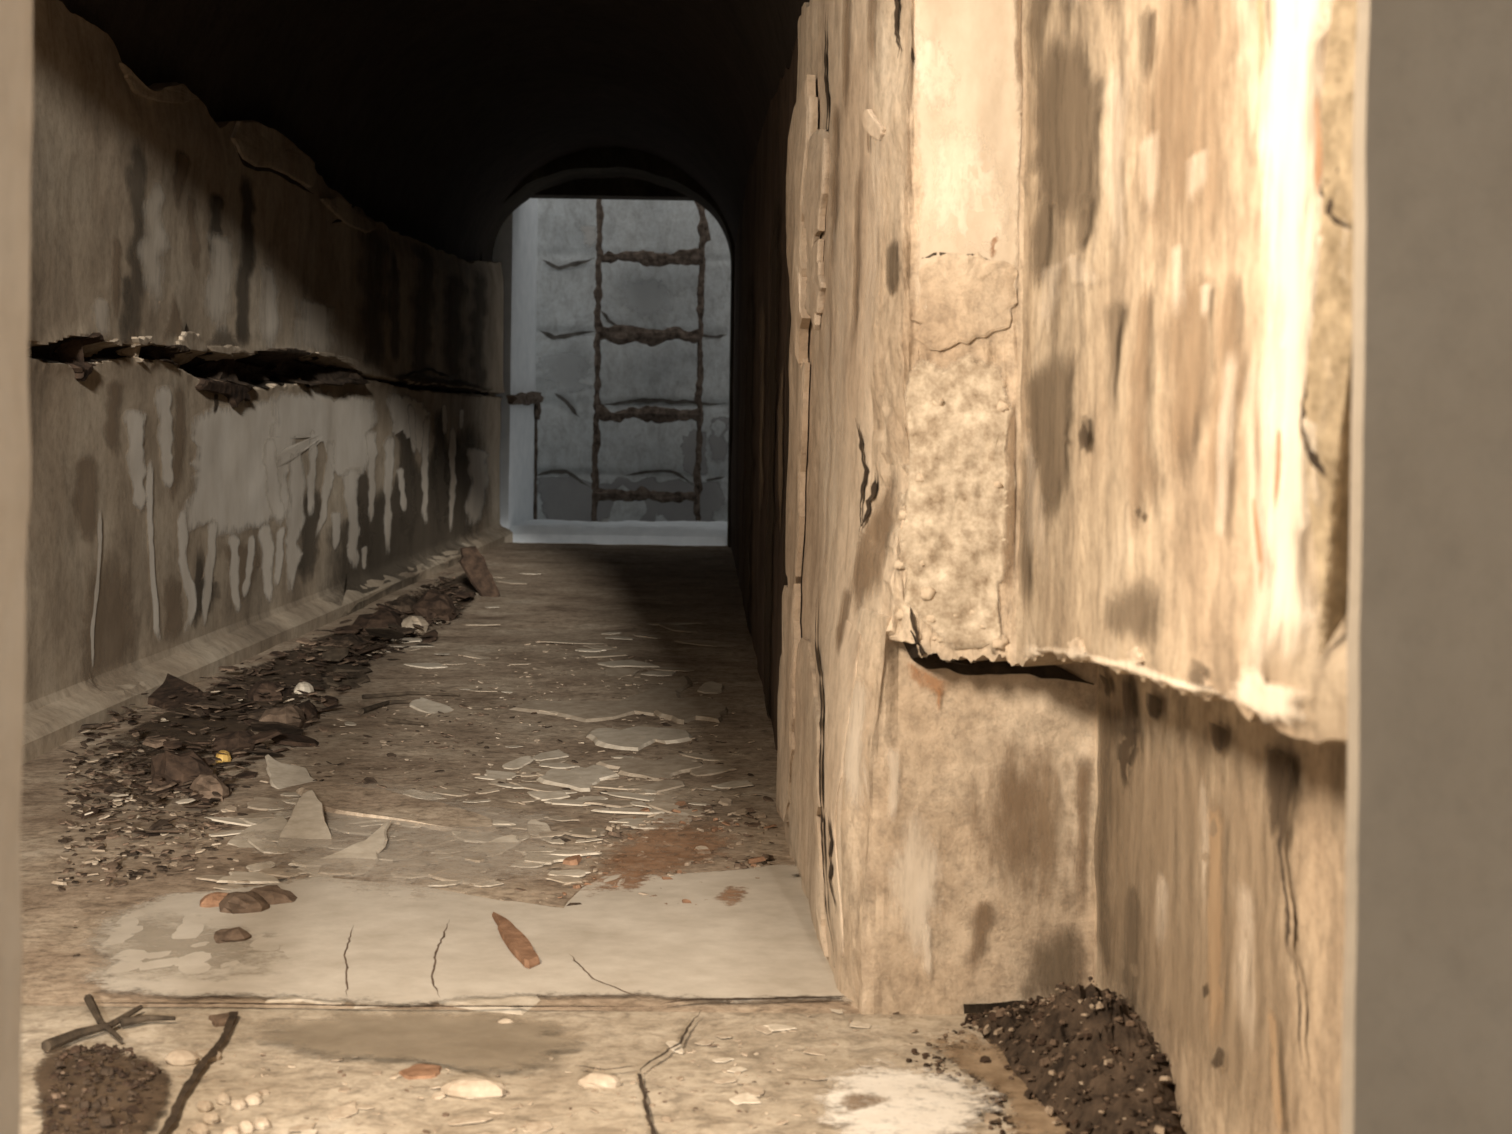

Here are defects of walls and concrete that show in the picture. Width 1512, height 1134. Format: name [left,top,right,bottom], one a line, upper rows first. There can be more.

crack [894,0,919,73]
water stain [95,147,336,352]
water stain [105,383,489,638]
crack [378,368,503,398]
crack [855,418,877,531]
spalling [894,355,1016,654]
water stain [1002,357,1089,599]
spalling [1078,422,1088,449]
water stain [1105,0,1330,651]
crack [903,607,1094,685]
crack [788,617,862,957]
water stain [1022,675,1294,1116]